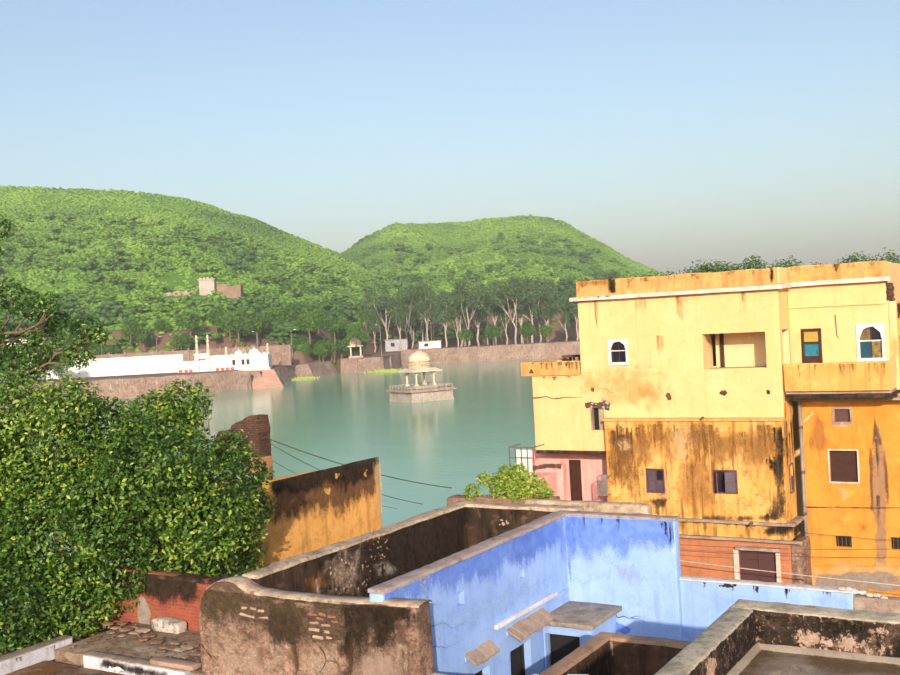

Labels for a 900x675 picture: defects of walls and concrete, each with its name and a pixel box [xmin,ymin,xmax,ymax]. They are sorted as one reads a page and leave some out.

damp [581,278,616,297]
damp [271,457,380,523]
damp [608,425,663,488]
damp [703,419,804,538]
damp [869,422,889,565]
spalling [301,608,342,642]
peeling [357,646,402,675]
peeling [794,627,889,655]